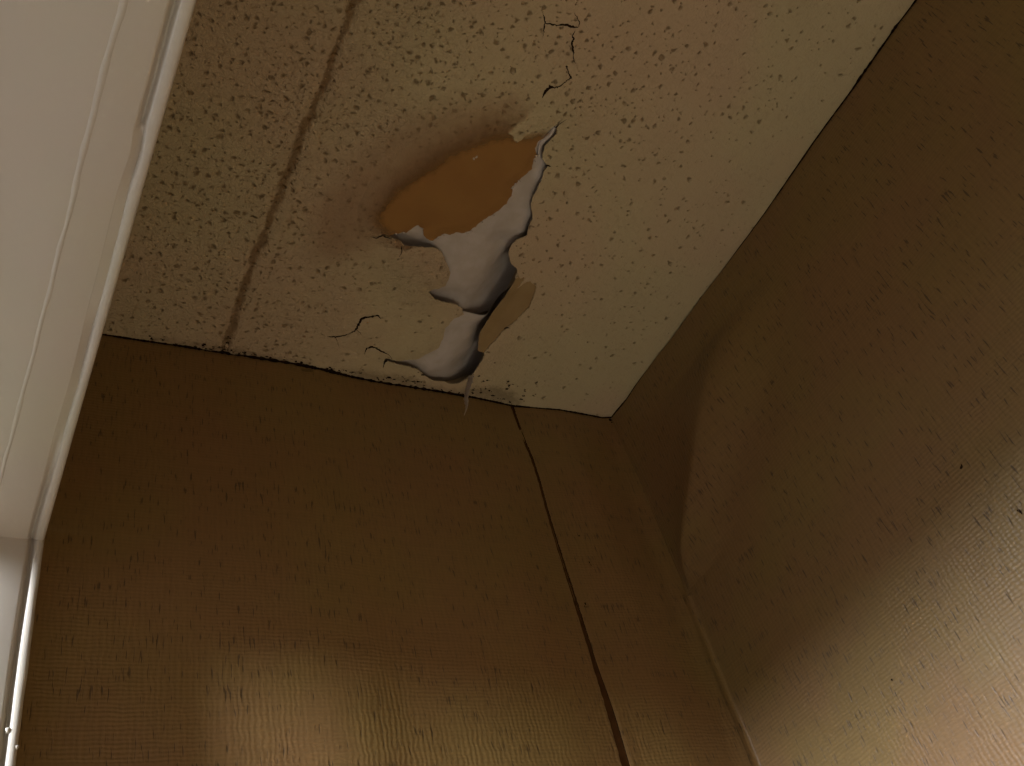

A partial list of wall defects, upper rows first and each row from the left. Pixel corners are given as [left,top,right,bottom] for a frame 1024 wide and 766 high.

flaking render [383,115,556,381]
crack [542,13,580,98]
crack [726,0,917,265]
crack [102,315,644,766]